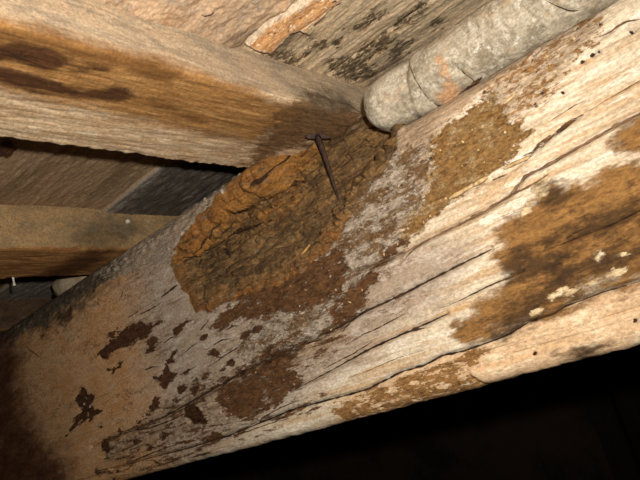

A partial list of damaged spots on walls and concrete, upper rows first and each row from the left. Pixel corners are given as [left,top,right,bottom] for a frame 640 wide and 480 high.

leakage [0,18,299,143]
leakage [119,162,246,216]
crack [183,206,277,281]
crack [249,155,290,189]
crack [347,80,640,278]
leakage [450,117,640,344]
crack [94,249,640,469]